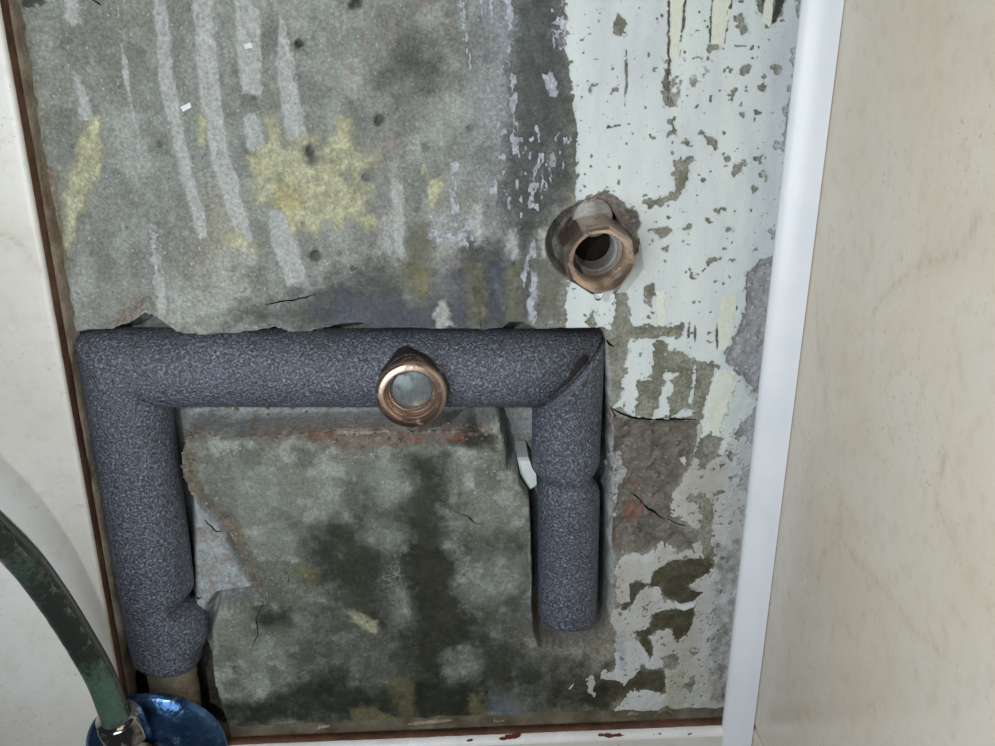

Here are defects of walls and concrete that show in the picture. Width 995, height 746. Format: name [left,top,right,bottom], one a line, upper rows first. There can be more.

spalling [180,431,259,593]
spalling [286,407,491,452]
water stain [224,457,607,726]
crack [633,494,686,526]
peeling [564,0,799,711]